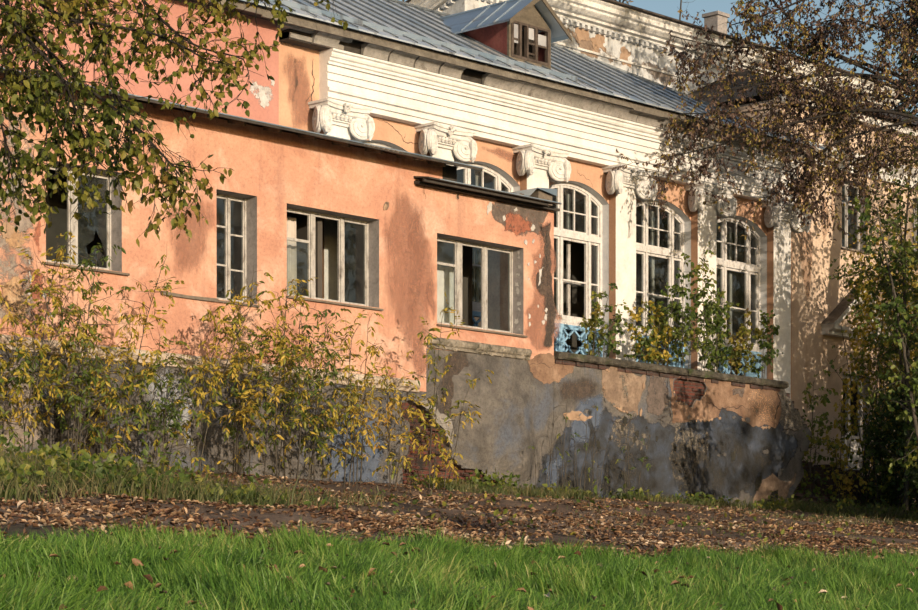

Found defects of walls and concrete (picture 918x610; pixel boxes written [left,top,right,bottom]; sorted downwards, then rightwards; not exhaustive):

peeling [565,26,677,88]
peeling [250,79,275,108]
flaking render [0,112,52,322]
flaking render [486,193,548,245]
water stain [526,223,561,349]
flaking render [527,353,574,384]
flaking render [563,405,595,421]
flaking render [596,366,658,456]
flaking render [669,376,806,482]
flaking render [753,473,796,505]